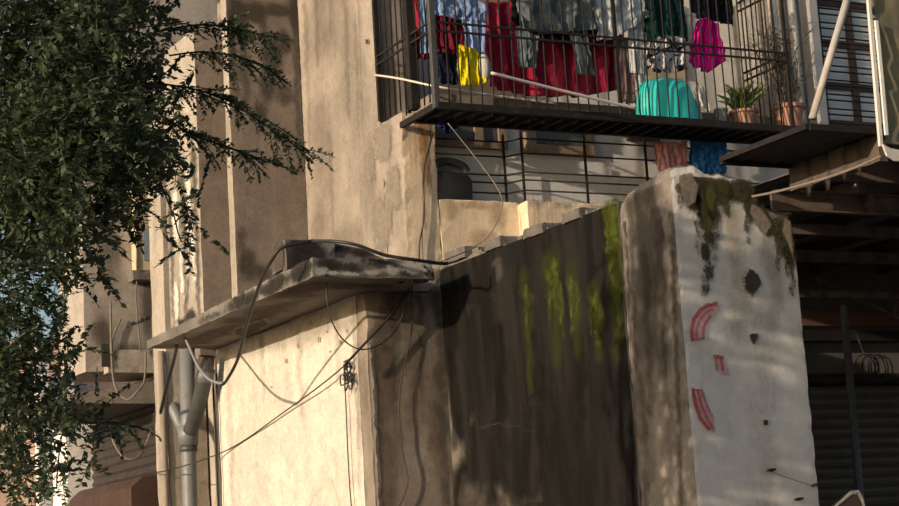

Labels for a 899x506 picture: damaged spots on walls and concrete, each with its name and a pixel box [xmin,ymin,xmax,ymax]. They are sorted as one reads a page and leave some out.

water stain [227,0,300,144]
spalling [679,173,699,207]
water stain [694,178,797,296]
spalling [750,204,795,266]
water stain [94,321,109,344]
water stain [141,285,151,335]
water stain [178,188,681,506]
spalling [742,268,761,297]